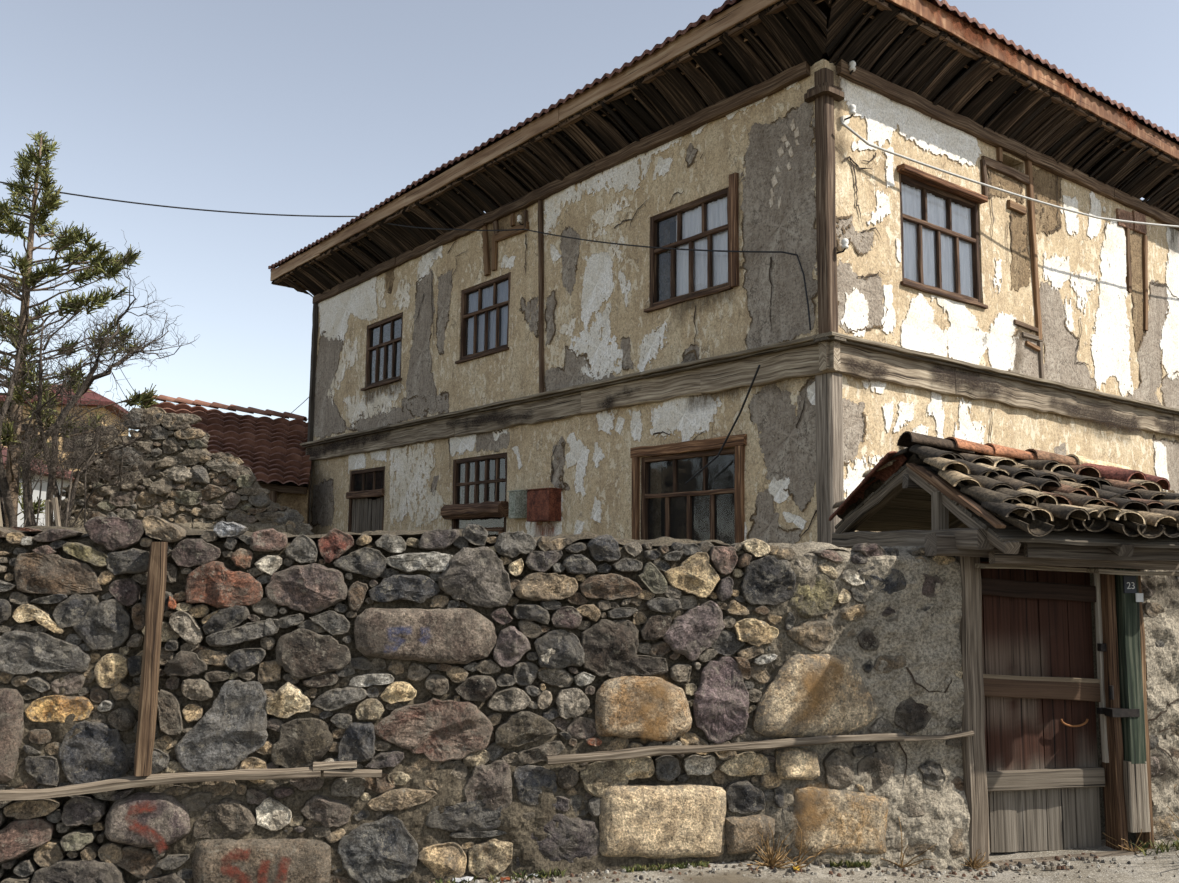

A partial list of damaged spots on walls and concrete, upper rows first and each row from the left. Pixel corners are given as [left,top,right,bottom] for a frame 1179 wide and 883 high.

peeling [726,96,768,120]
peeling [519,124,707,392]
flaking render [740,101,818,350]
peeling [836,77,1179,409]
flaking render [313,245,453,439]
flaking render [311,478,334,527]
peeling [348,442,446,528]
peeling [449,434,477,457]
peeling [525,395,722,538]
flaking render [744,377,816,544]
flaking render [1153,434,1179,493]